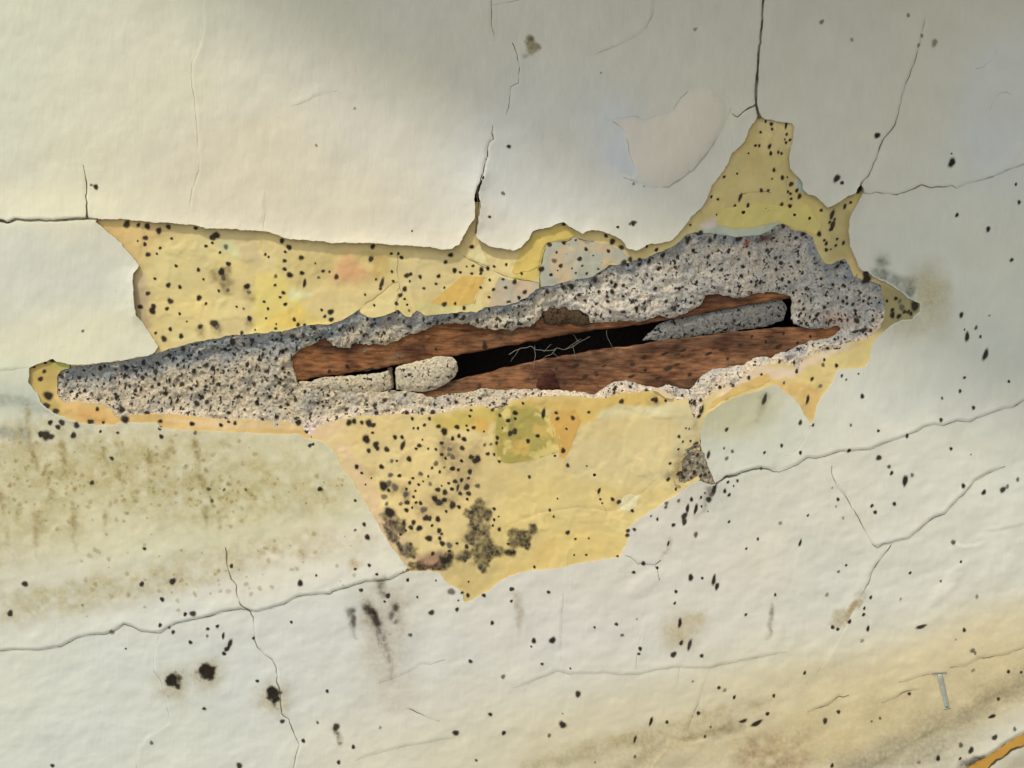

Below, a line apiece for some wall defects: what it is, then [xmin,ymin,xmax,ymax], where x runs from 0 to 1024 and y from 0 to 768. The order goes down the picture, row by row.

crack [733,0,764,119]
crack [475,0,520,234]
crack [0,165,98,224]
damp [123,221,173,256]
damp [204,232,231,292]
damp [274,239,338,306]
damp [539,221,695,320]
spalling [29,117,920,602]
damp [32,253,539,581]
crack [715,450,891,586]
crack [203,547,257,646]
damp [365,593,398,631]